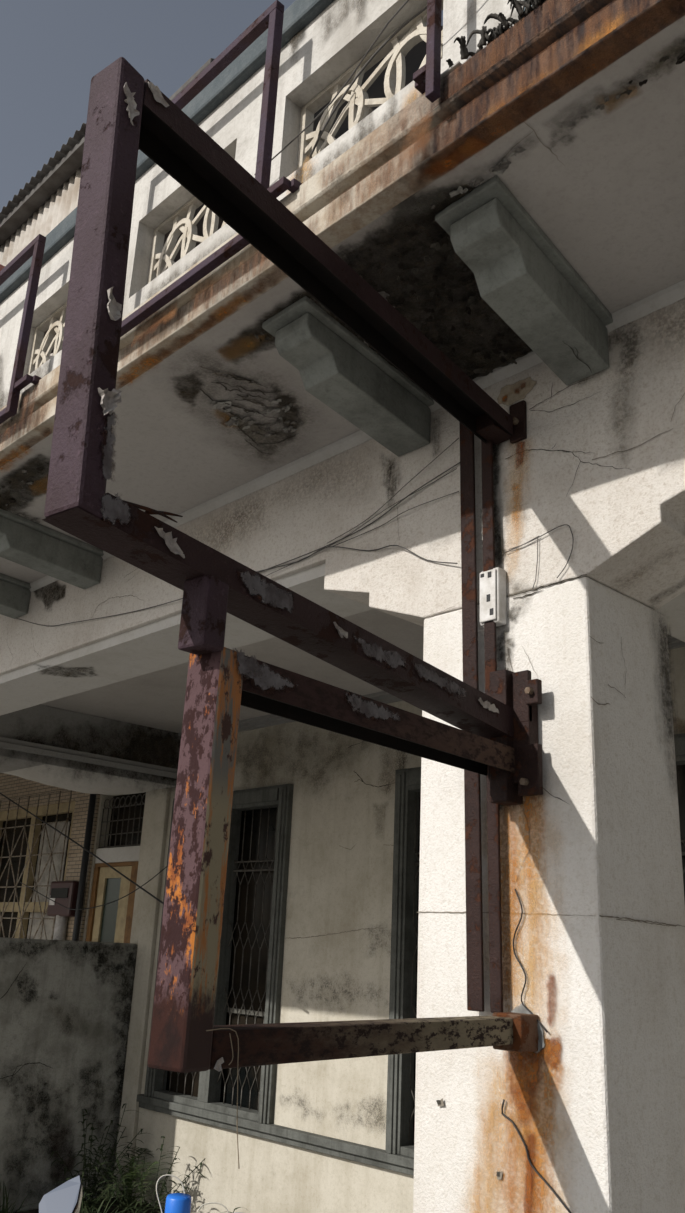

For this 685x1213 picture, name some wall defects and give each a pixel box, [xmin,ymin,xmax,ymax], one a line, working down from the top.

corrosion [331,0,685,207]
peeling [176,292,398,456]
crack [529,343,593,412]
crack [506,393,685,494]
corrosion [500,795,554,1023]
water stain [8,939,135,1048]
water stain [2,1069,75,1198]
water stain [81,1066,125,1128]
corrosion [473,1039,561,1213]